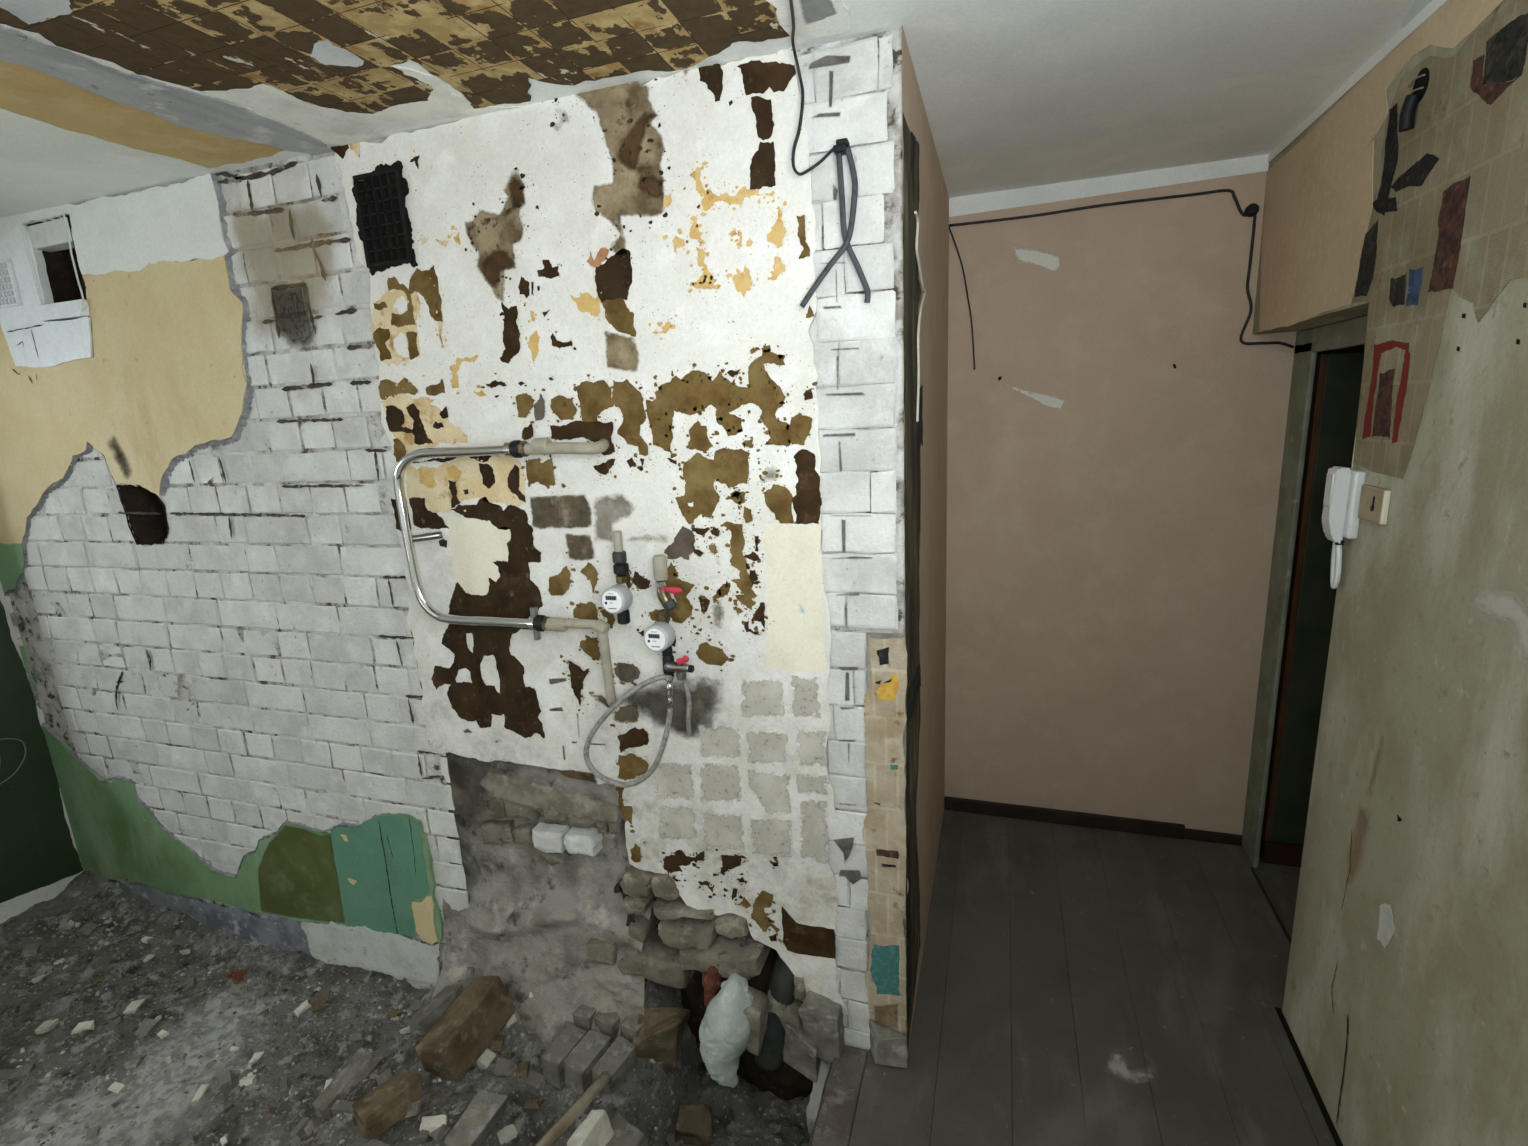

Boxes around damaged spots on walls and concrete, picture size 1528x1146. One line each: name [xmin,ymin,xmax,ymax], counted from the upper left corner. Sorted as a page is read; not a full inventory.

spalling [0,0,72,24]
spalling [310,40,364,67]
peeling [684,63,733,106]
peeling [518,277,534,298]
peeling [550,333,573,348]
peeling [601,298,638,371]
flaking render [2,142,526,944]
peeling [692,541,718,557]
flaking render [696,33,898,1051]
peeling [549,562,651,780]
spalling [617,844,806,1071]
spalling [737,1049,813,1101]